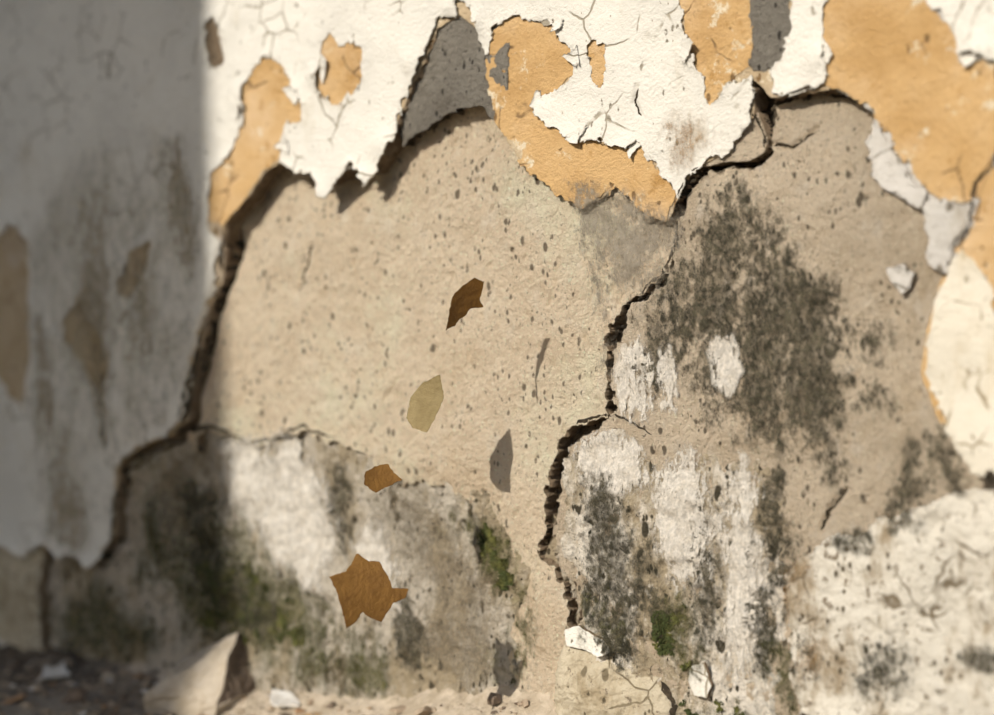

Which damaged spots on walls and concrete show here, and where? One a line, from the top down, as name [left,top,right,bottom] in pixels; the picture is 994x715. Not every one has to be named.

peeling [315,33,362,106]
peeling [679,0,792,105]
peeling [926,0,994,60]
peeling [208,57,301,225]
crack [623,85,863,327]
crack [99,230,331,570]
water stain [180,433,488,677]
crack [545,527,553,542]
crack [572,414,652,445]
water stain [568,179,896,680]
water stain [885,425,968,537]
water stain [855,643,911,706]